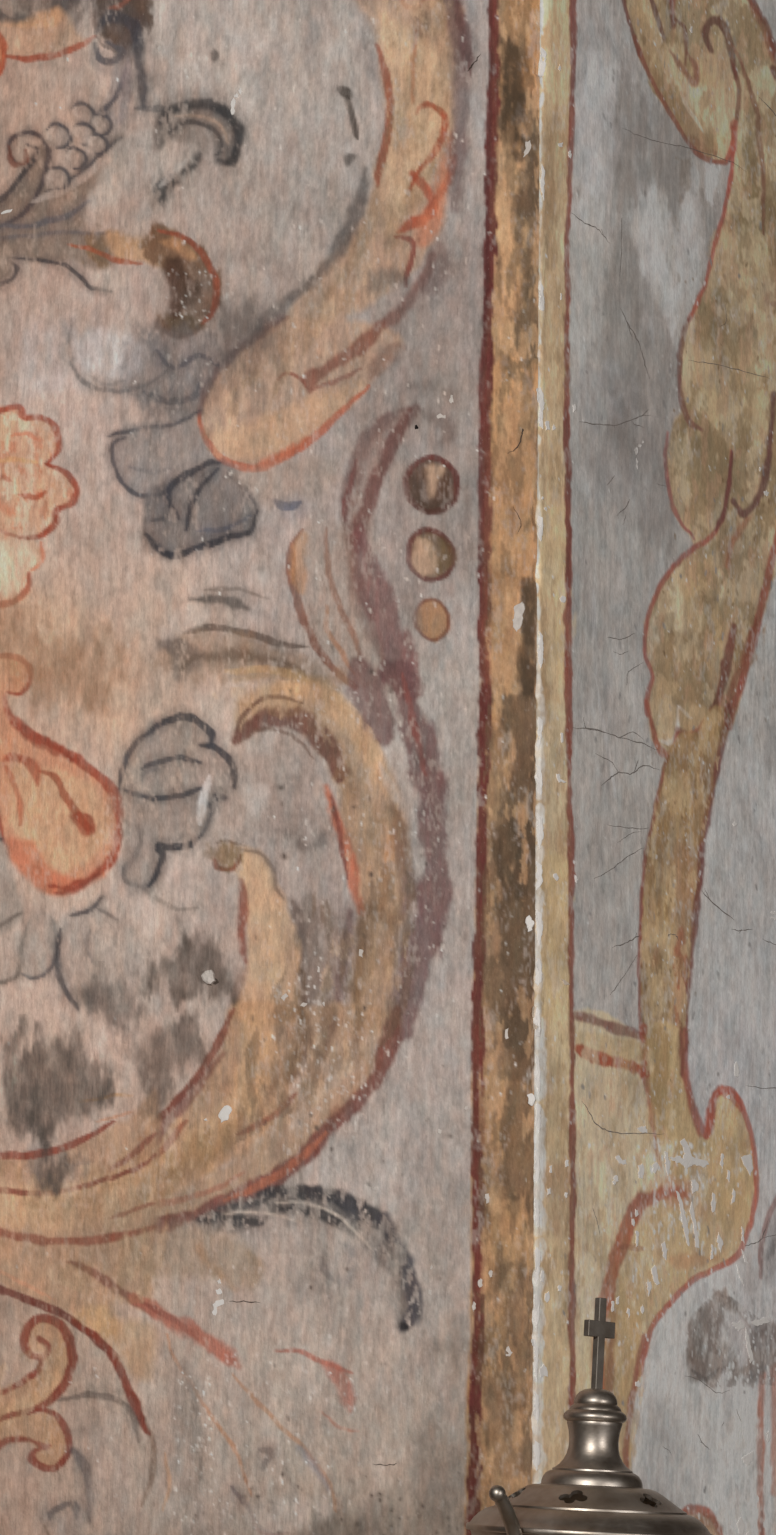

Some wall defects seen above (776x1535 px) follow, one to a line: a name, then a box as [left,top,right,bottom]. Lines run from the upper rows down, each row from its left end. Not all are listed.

peeling [612,1138,753,1260]
peeling [611,1242,667,1317]
peeling [732,1318,770,1363]